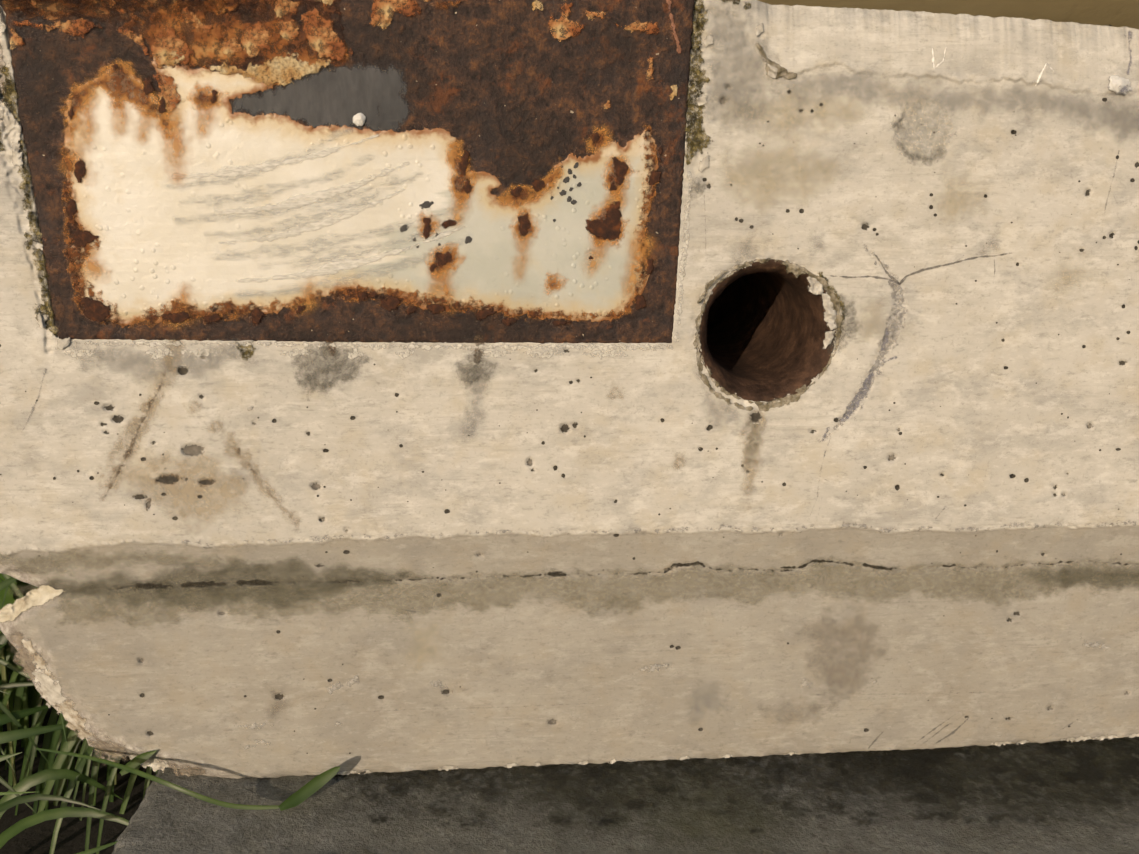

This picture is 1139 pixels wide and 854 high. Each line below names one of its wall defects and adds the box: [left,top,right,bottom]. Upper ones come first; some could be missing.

peeling [0,0,410,145]
corrosion [62,62,663,328]
crack [110,579,272,590]
crack [504,570,566,578]
crack [616,559,892,575]
spalling [0,585,205,777]
leakage [886,748,952,779]